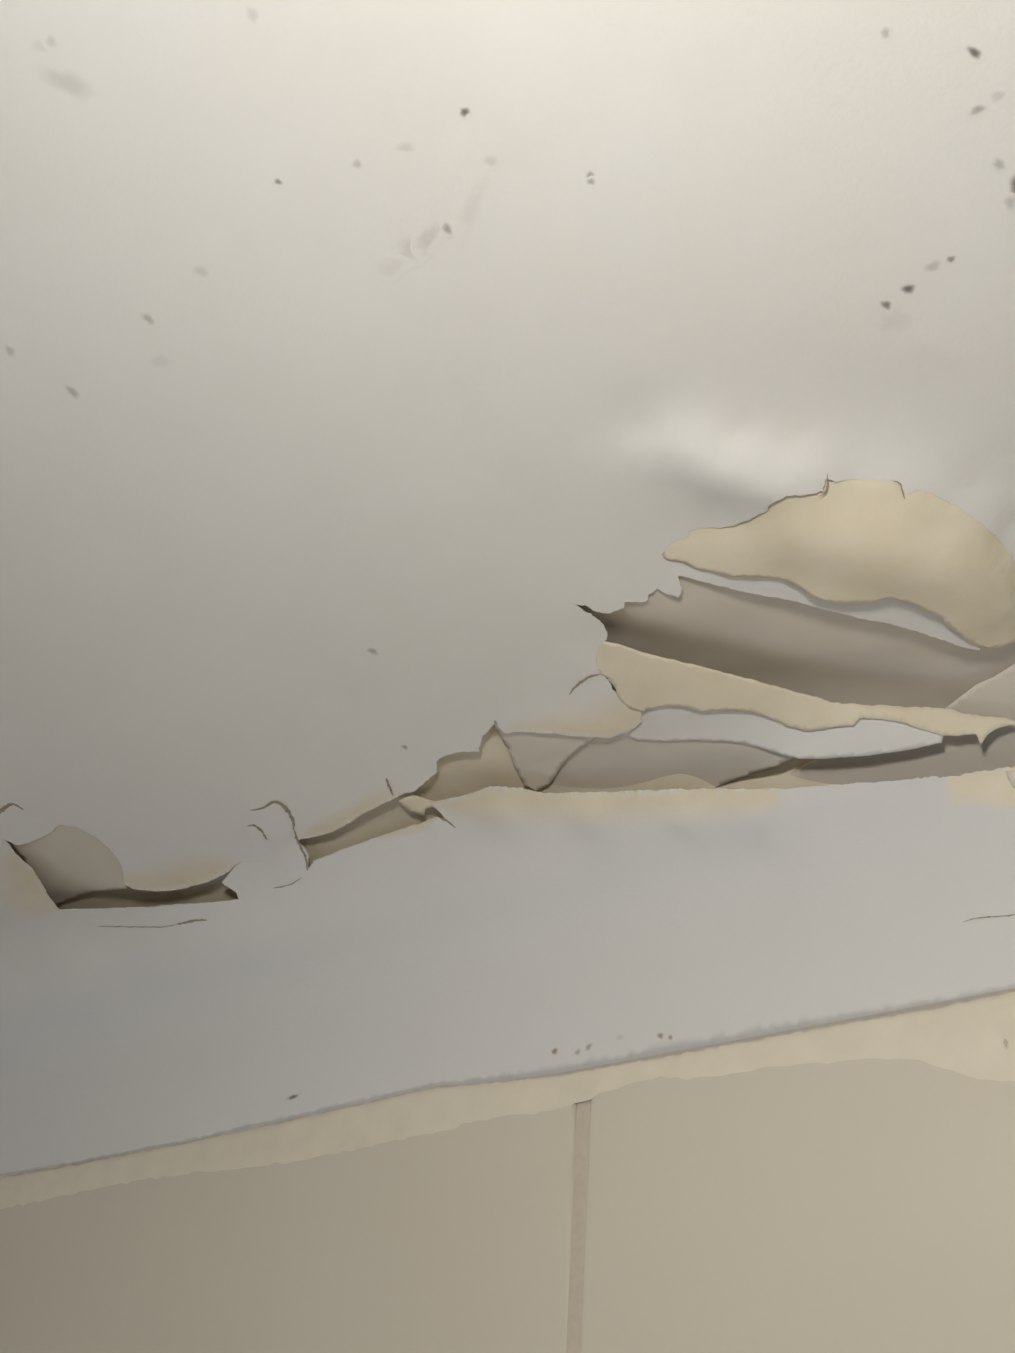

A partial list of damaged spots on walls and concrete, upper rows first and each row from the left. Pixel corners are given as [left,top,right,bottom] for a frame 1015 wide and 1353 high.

leakage [24,31,107,109]
leakage [963,43,986,63]
leakage [457,105,473,120]
leakage [370,152,501,282]
leakage [989,154,1015,214]
leakage [872,254,958,339]
peeling [0,478,1015,940]